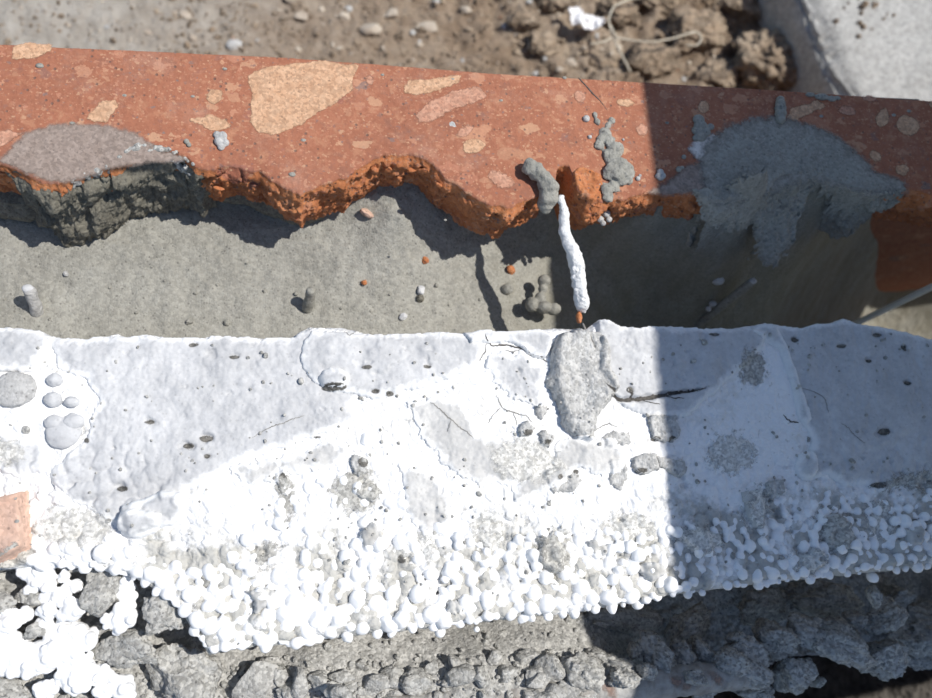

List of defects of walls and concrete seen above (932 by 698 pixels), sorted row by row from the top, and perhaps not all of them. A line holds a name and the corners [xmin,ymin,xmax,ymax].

spalling [205,172,324,224]
spalling [342,167,450,210]
spalling [463,204,528,234]
spalling [566,166,696,226]
crack [605,382,705,404]
damp [491,437,565,484]
damp [32,506,115,549]
damp [274,477,299,524]
damp [327,466,382,517]
damp [793,471,932,574]
damp [247,540,286,570]
damp [532,527,570,576]